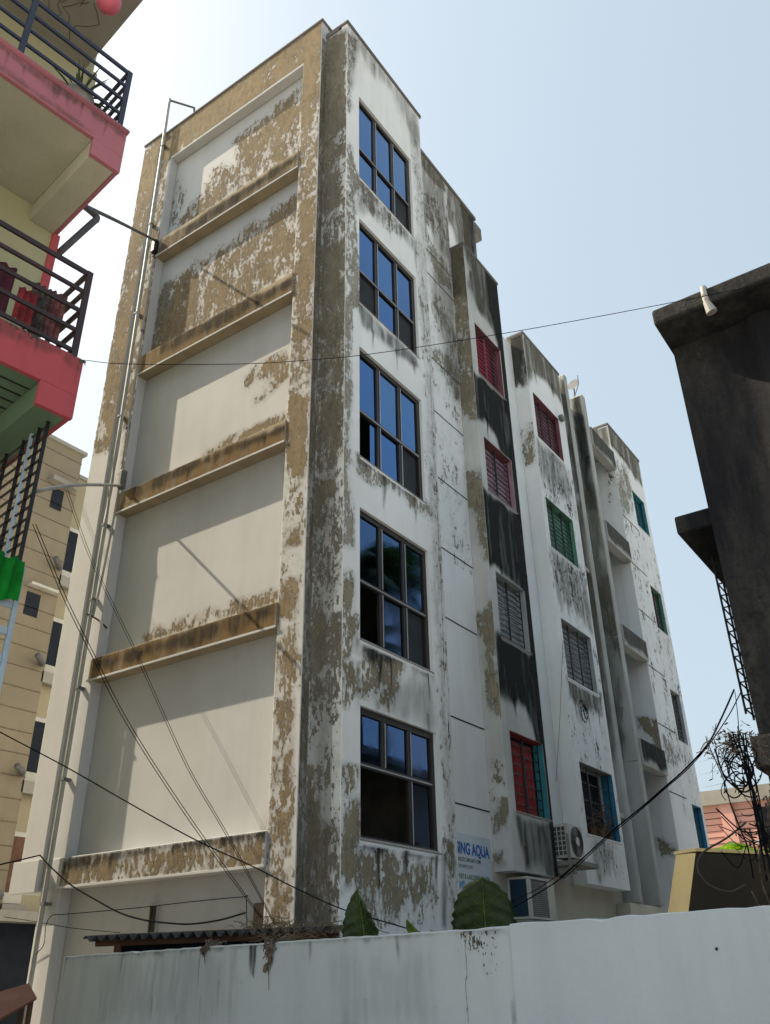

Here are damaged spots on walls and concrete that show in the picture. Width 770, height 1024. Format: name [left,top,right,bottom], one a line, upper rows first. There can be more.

damp [153,457,210,486]
peeling [60,22,488,934]
damp [423,160,648,877]
damp [364,647,392,681]
peeling [476,602,501,716]